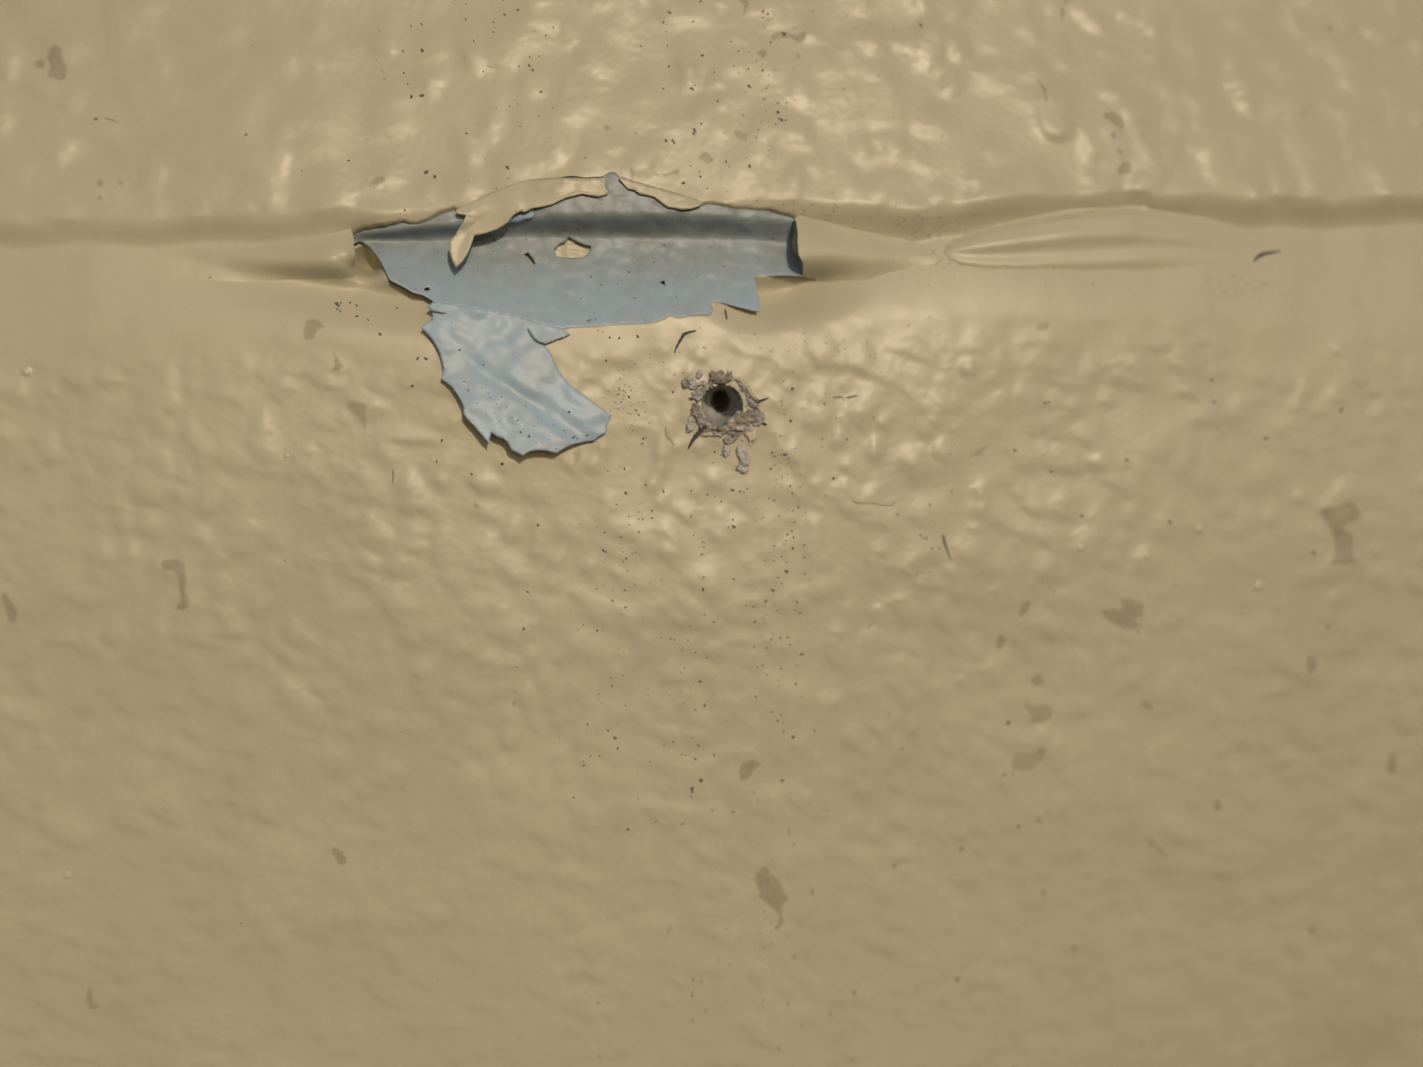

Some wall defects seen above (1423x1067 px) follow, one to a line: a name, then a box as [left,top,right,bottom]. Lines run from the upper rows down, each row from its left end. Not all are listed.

peeling [353,172,803,456]
spalling [687,370,760,474]